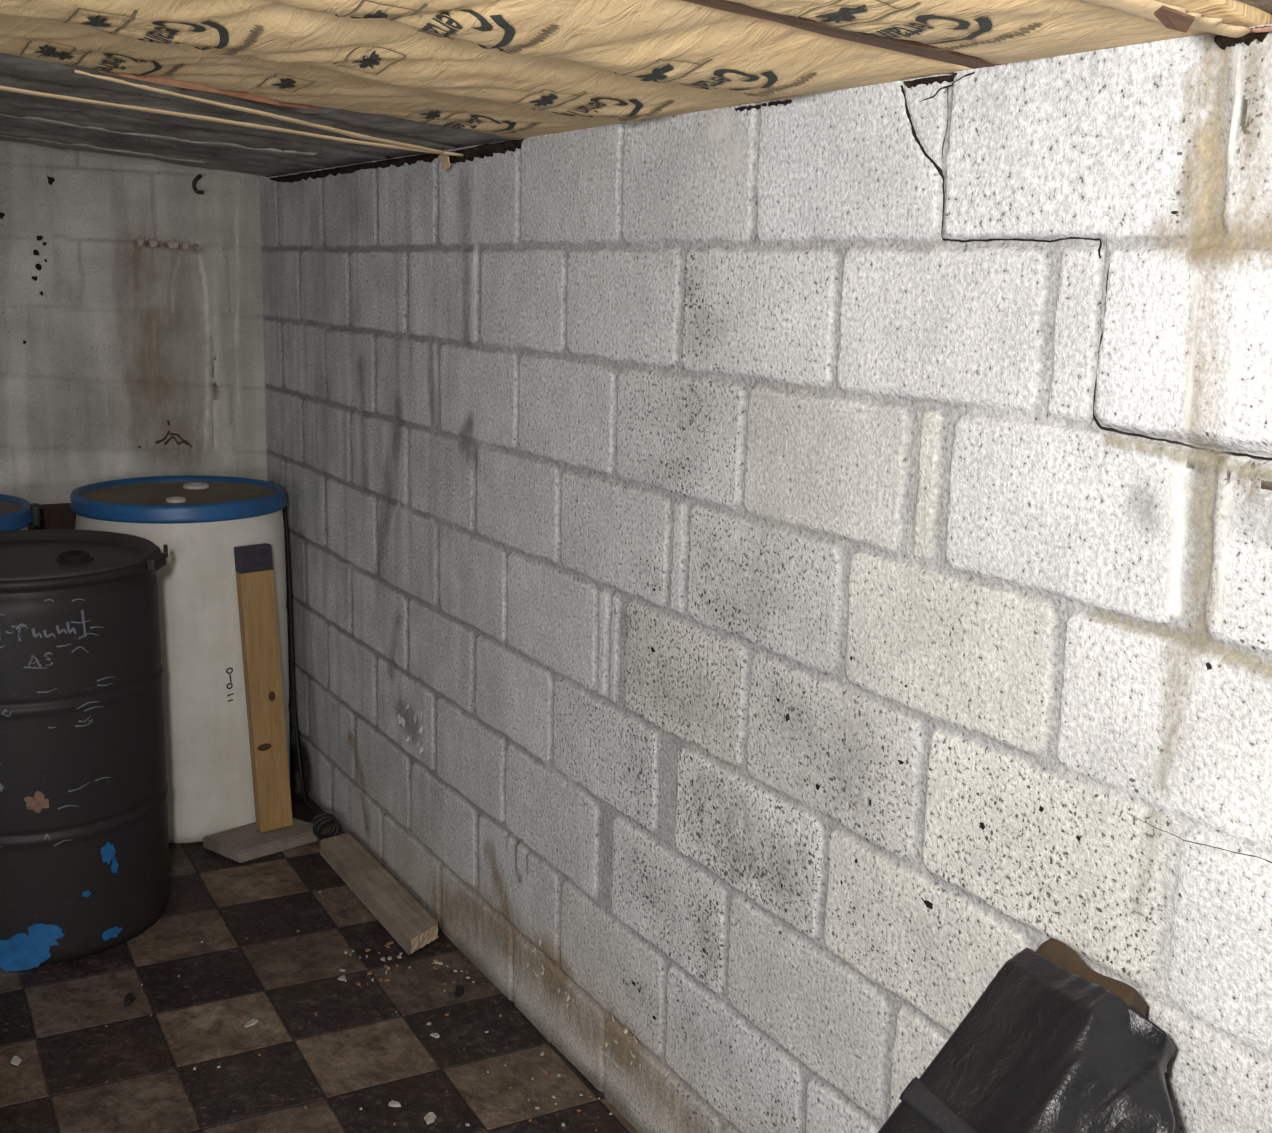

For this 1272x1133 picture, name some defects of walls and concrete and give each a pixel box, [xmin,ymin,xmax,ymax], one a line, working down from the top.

leakage [196,242,232,468]
crack [900,71,1272,461]
leakage [1178,34,1272,435]